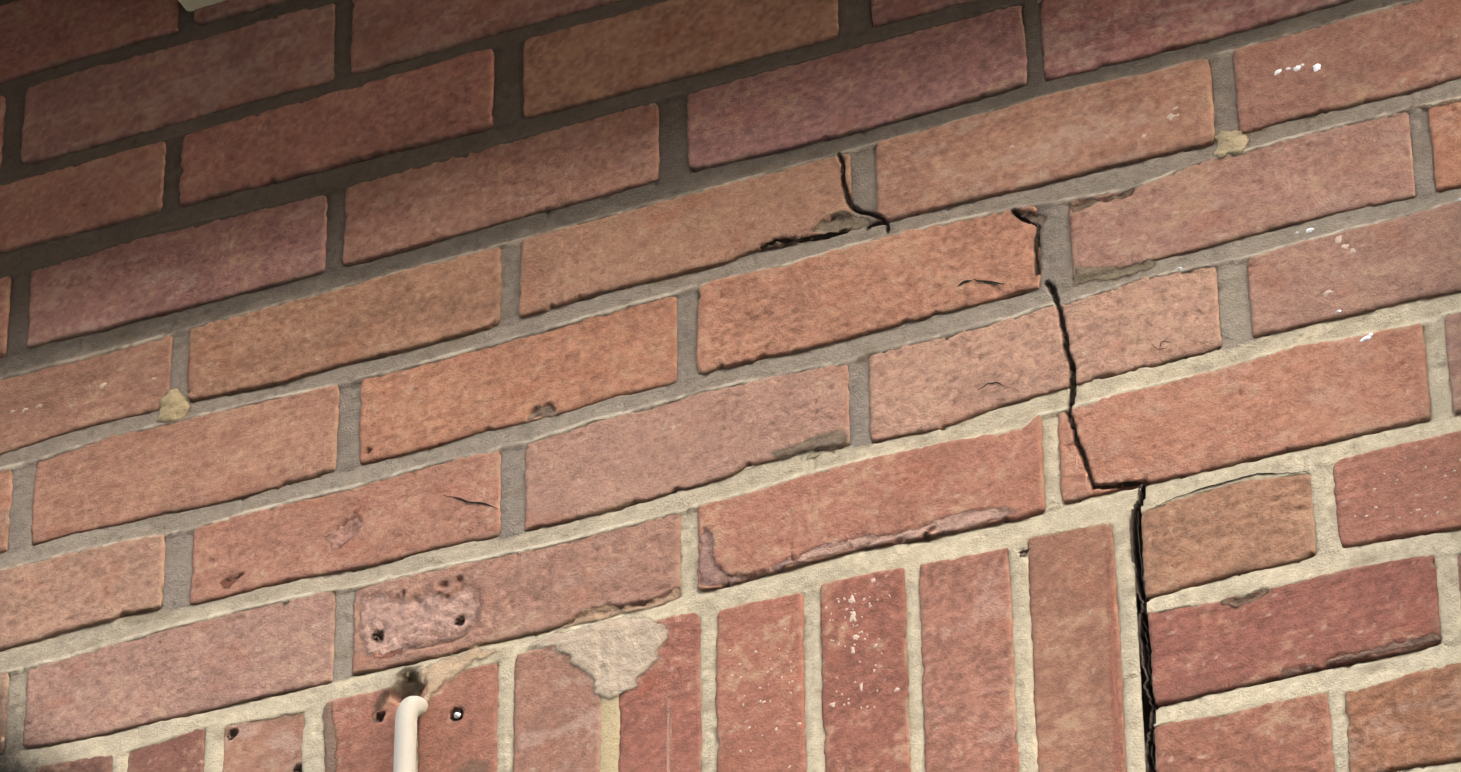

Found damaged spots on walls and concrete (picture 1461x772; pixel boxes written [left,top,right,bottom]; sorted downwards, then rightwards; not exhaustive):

crack [957,279,1003,287]
crack [1012,210,1306,772]